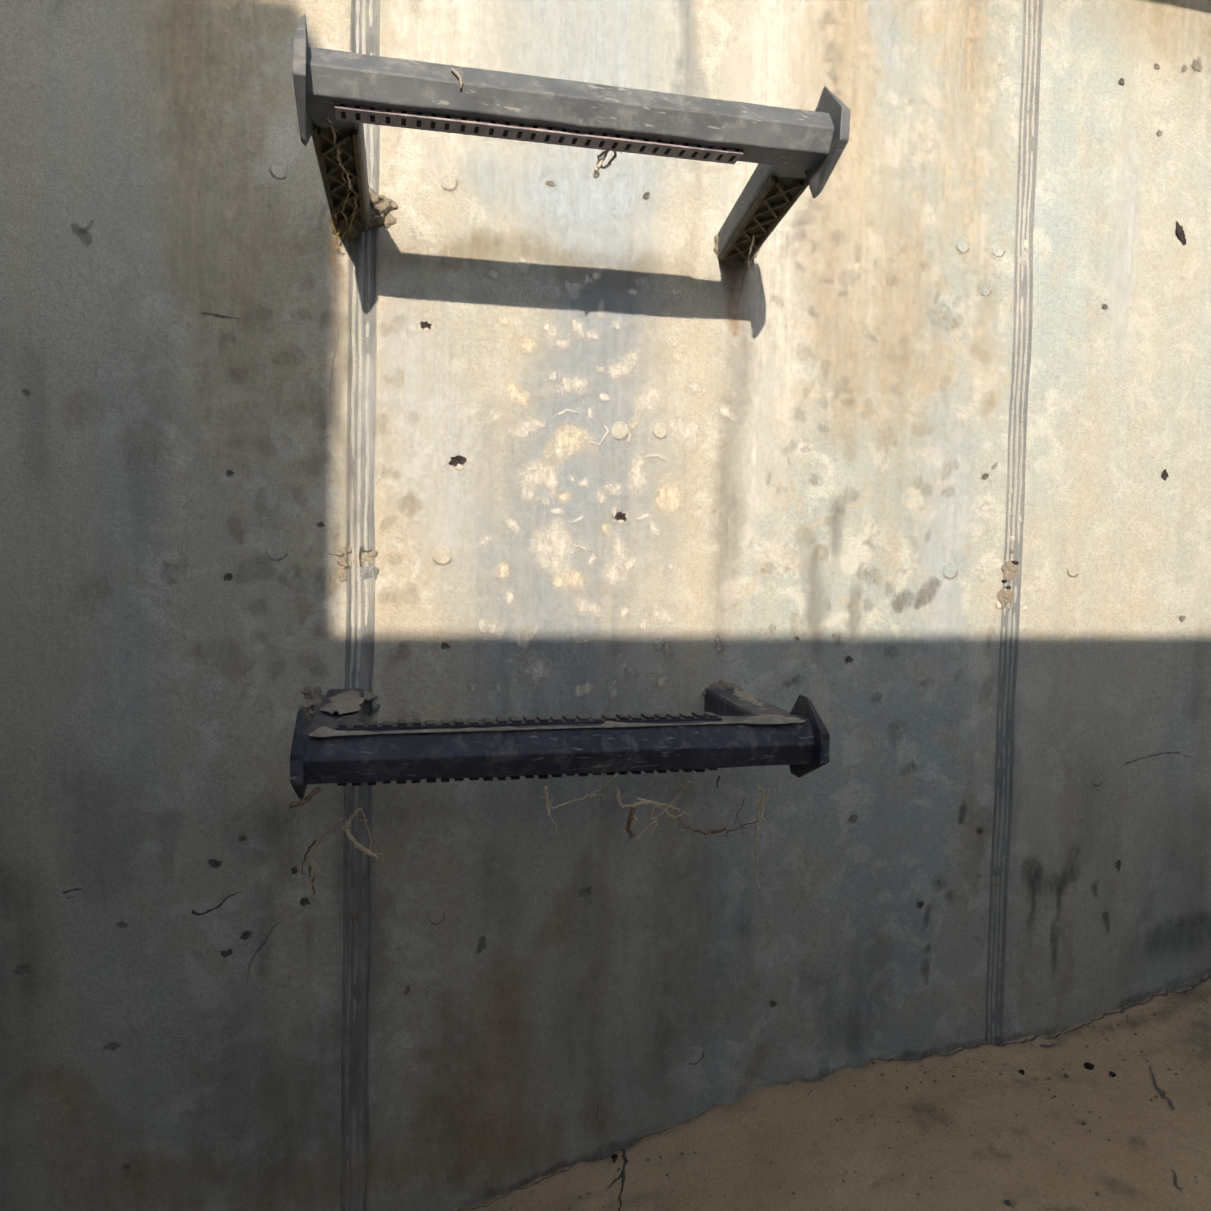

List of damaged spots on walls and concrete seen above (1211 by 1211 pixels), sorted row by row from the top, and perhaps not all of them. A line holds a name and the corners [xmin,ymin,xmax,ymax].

water stain [544,319,598,348]
water stain [549,372,587,390]
water stain [600,353,637,378]
water stain [507,383,543,435]
water stain [523,409,609,615]
water stain [598,455,661,584]
water stain [637,485,680,533]